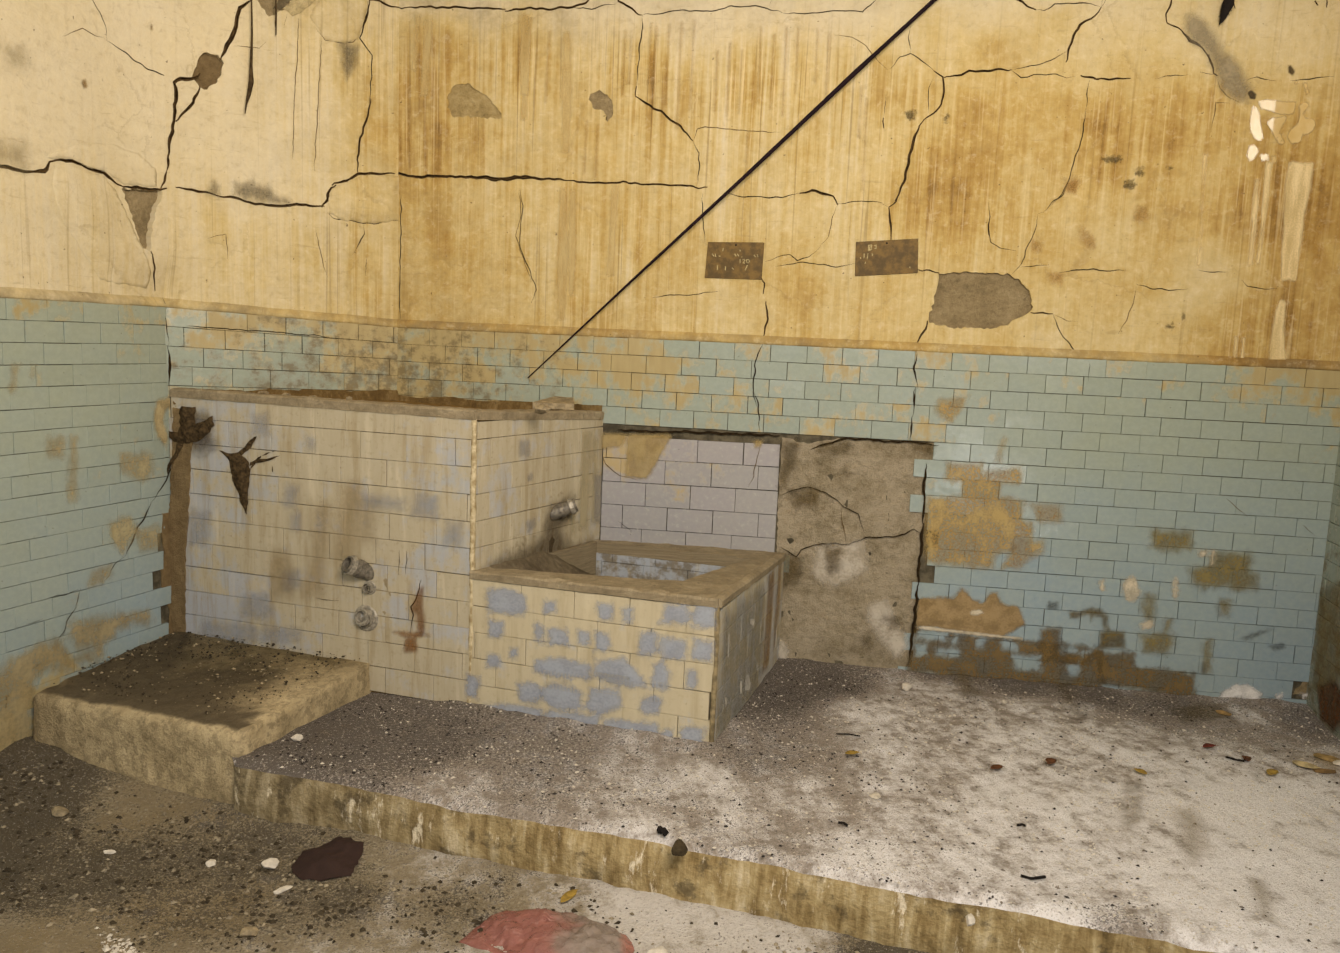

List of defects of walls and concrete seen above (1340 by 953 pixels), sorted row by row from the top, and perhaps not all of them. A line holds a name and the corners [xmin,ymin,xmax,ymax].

flaking render [448,84,502,119]
crack [0,0,1334,487]
flaking render [929,272,1032,329]
damp [1249,162,1272,265]
damp [1270,300,1285,359]
damp [1281,162,1313,281]
crack [29,468,171,643]
corrosion [403,589,424,651]
peeling [488,602,715,742]
flaking render [776,437,934,668]
crack [780,321,938,658]
corrosion [1314,589,1340,731]